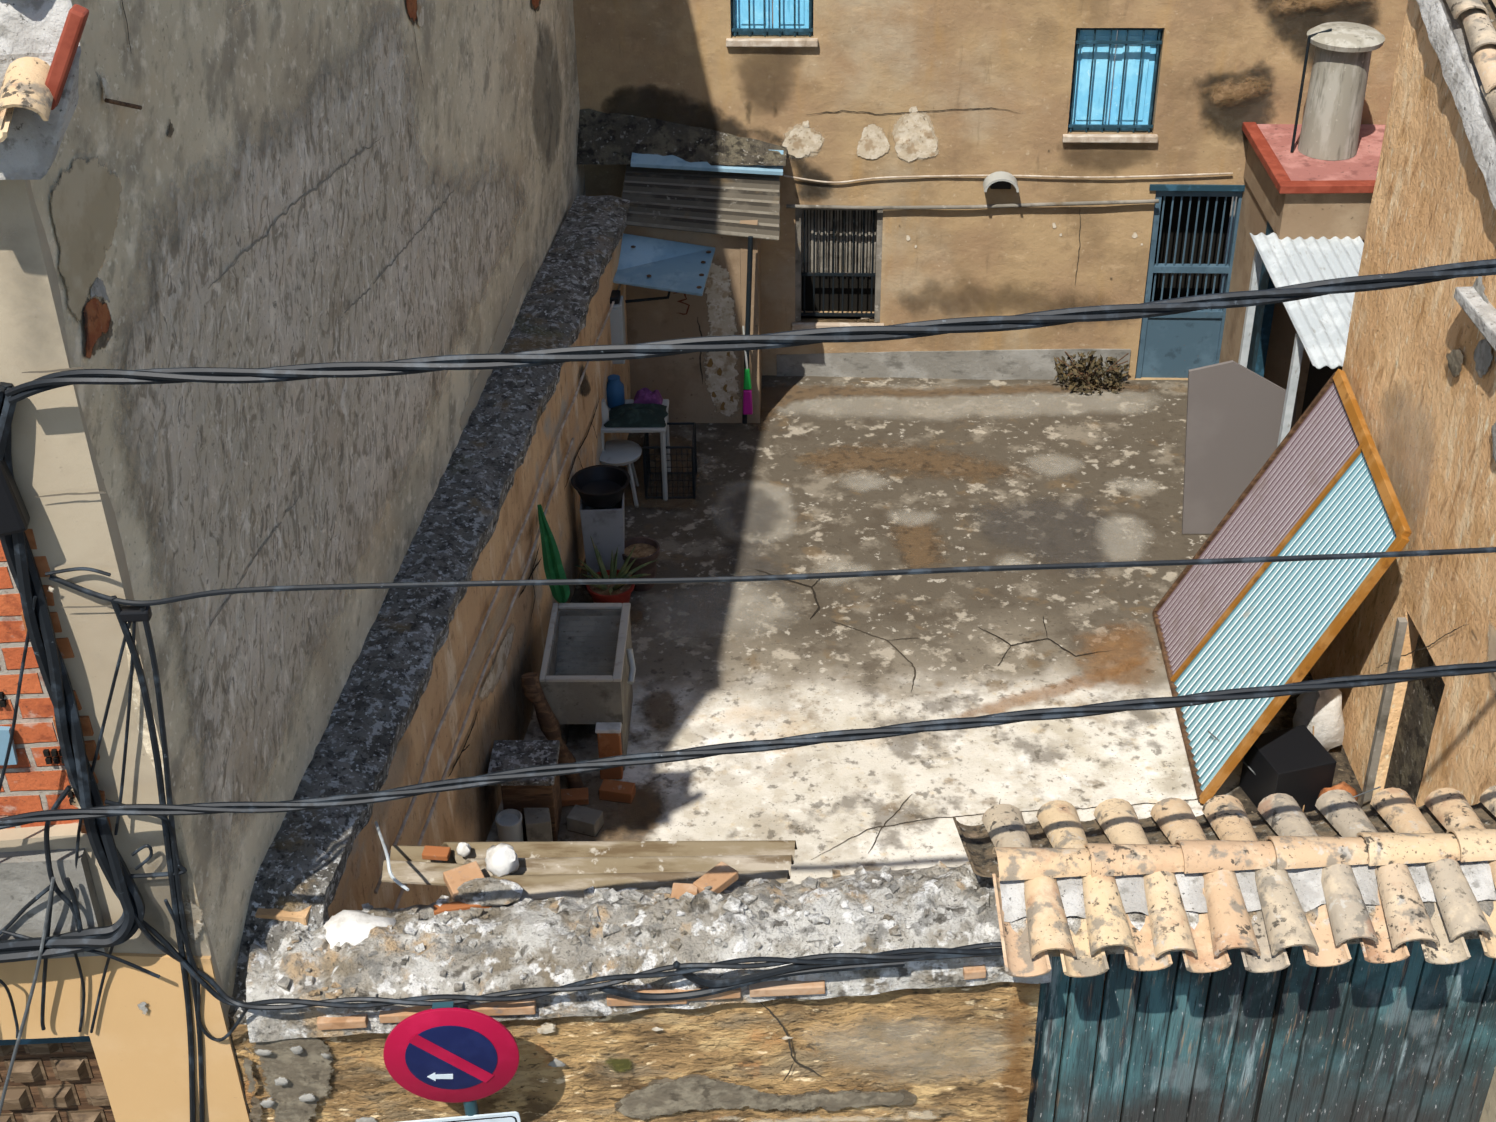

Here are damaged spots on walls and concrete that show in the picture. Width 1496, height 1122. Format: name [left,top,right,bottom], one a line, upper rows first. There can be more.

spalling [782,120,824,158]
spalling [856,106,938,162]
spalling [80,278,113,358]
crack [755,569,916,691]
crack [979,616,1106,665]
spalling [614,1074,935,1122]